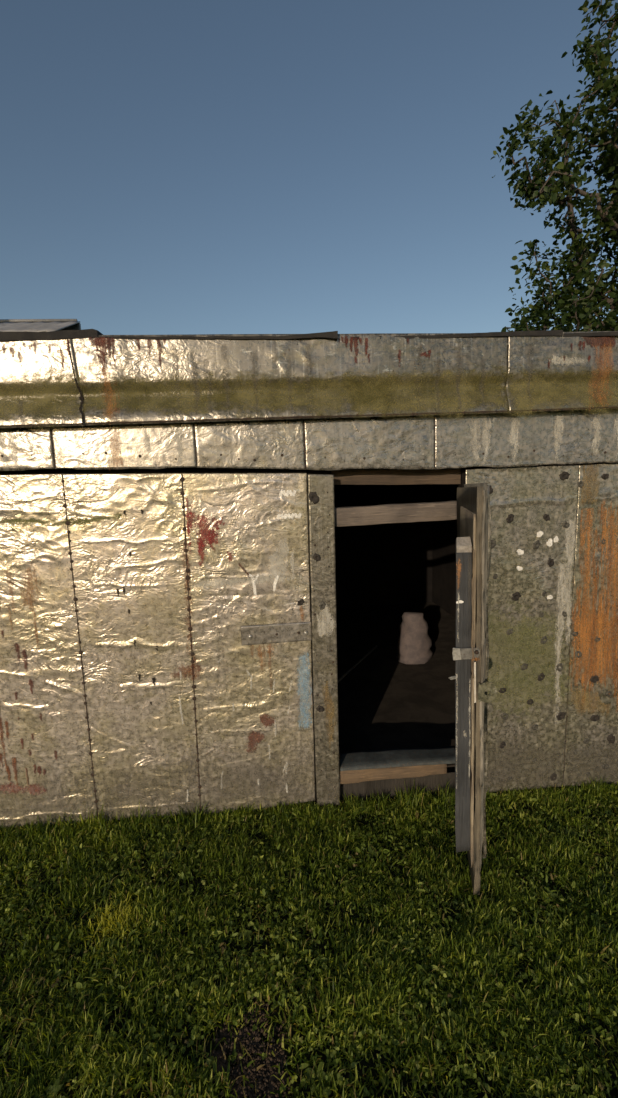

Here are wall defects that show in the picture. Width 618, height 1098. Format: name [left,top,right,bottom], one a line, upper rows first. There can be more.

crack [67,339,84,425]
corrosion [89,337,166,376]
corrosion [548,336,616,383]
corrosion [1,568,40,643]
corrosion [571,505,618,706]
corrosion [15,643,33,694]
corrosion [0,718,46,790]